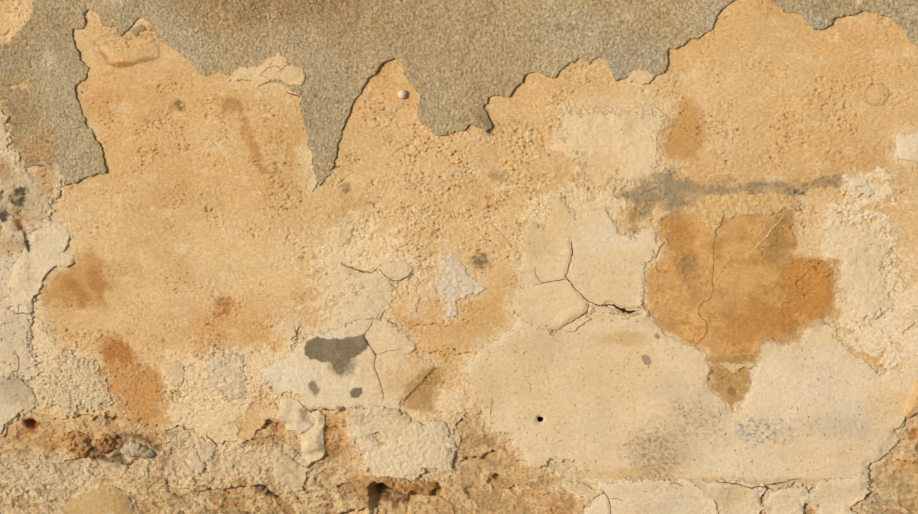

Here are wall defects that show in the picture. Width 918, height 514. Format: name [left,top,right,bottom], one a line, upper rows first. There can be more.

peeling [771,0,918,47]
peeling [0,0,736,380]
peeling [894,132,918,163]
crack [533,243,639,330]
crack [696,237,715,344]
crack [363,320,398,402]
peeling [0,190,918,514]